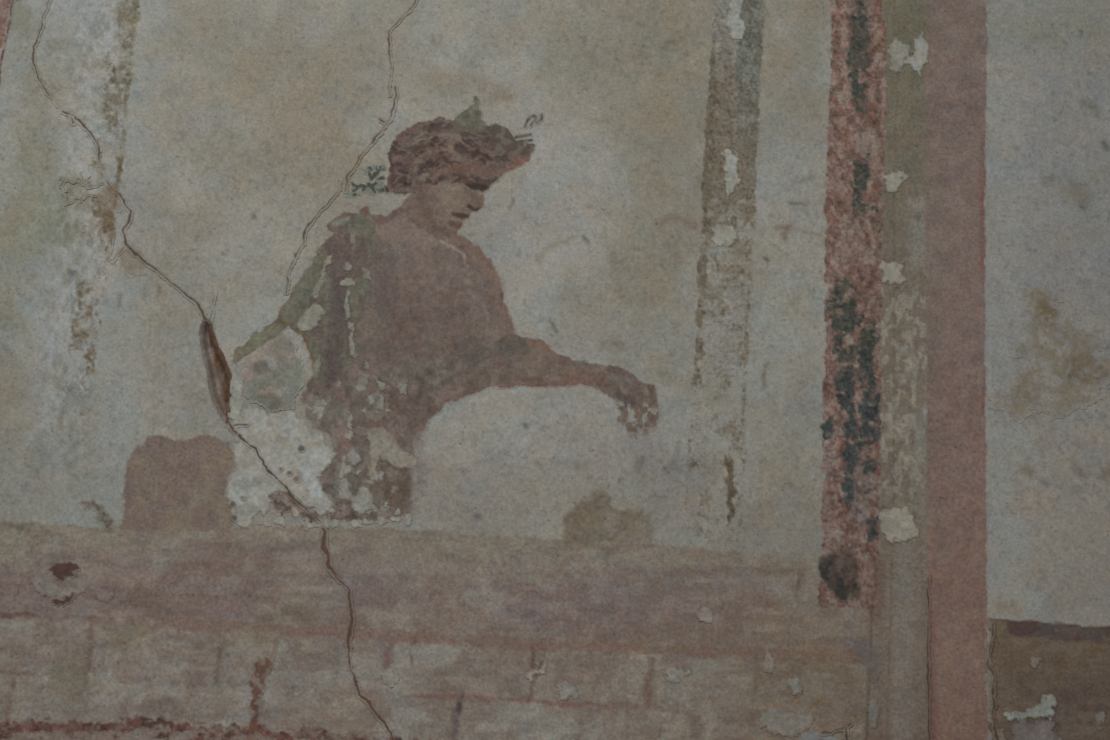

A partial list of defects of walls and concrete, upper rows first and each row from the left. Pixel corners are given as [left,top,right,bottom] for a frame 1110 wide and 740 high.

flaking render [725,0,746,40]
flaking render [887,31,929,78]
crack [30,0,217,325]
crack [284,0,419,295]
flaking render [720,148,741,197]
flaking render [883,169,910,193]
flaking render [710,224,738,248]
flaking render [879,260,907,285]
flaking render [296,253,409,410]
flaking render [198,321,419,531]
flaking render [878,506,919,544]
crack [224,417,395,740]